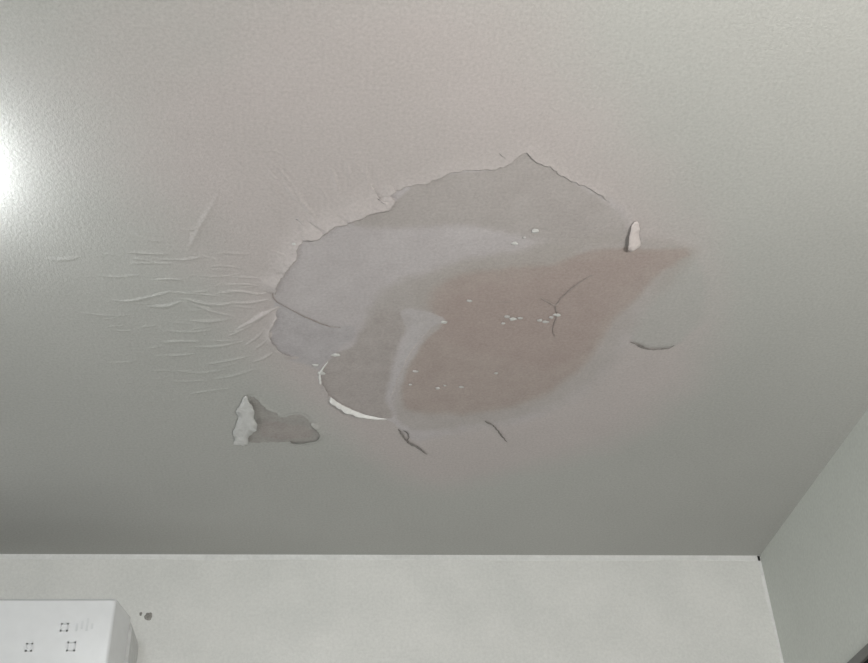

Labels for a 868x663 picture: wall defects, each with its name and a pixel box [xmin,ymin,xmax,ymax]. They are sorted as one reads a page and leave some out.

water stain [0,0,808,515]
peeling [251,137,646,447]
crack [631,342,674,350]
peeling [233,393,328,447]
crack [398,429,426,454]